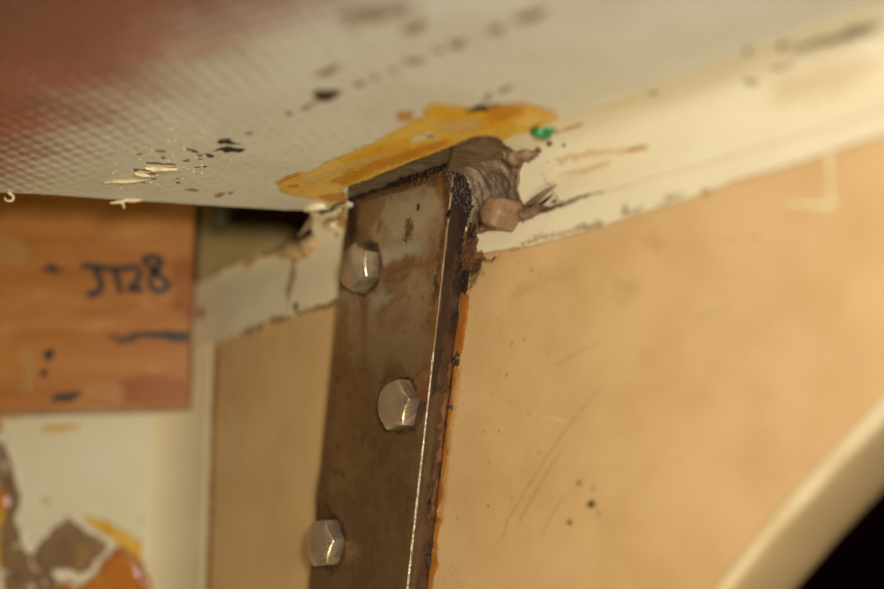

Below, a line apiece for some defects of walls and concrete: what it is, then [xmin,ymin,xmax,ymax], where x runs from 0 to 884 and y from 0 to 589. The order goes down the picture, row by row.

spalling [286,90,340,115]
spalling [465,86,512,113]
spalling [303,202,346,236]
peeling [522,185,557,207]
rust [242,299,351,375]
rust [343,162,496,589]
peeling [0,433,111,589]
rust [323,514,347,570]